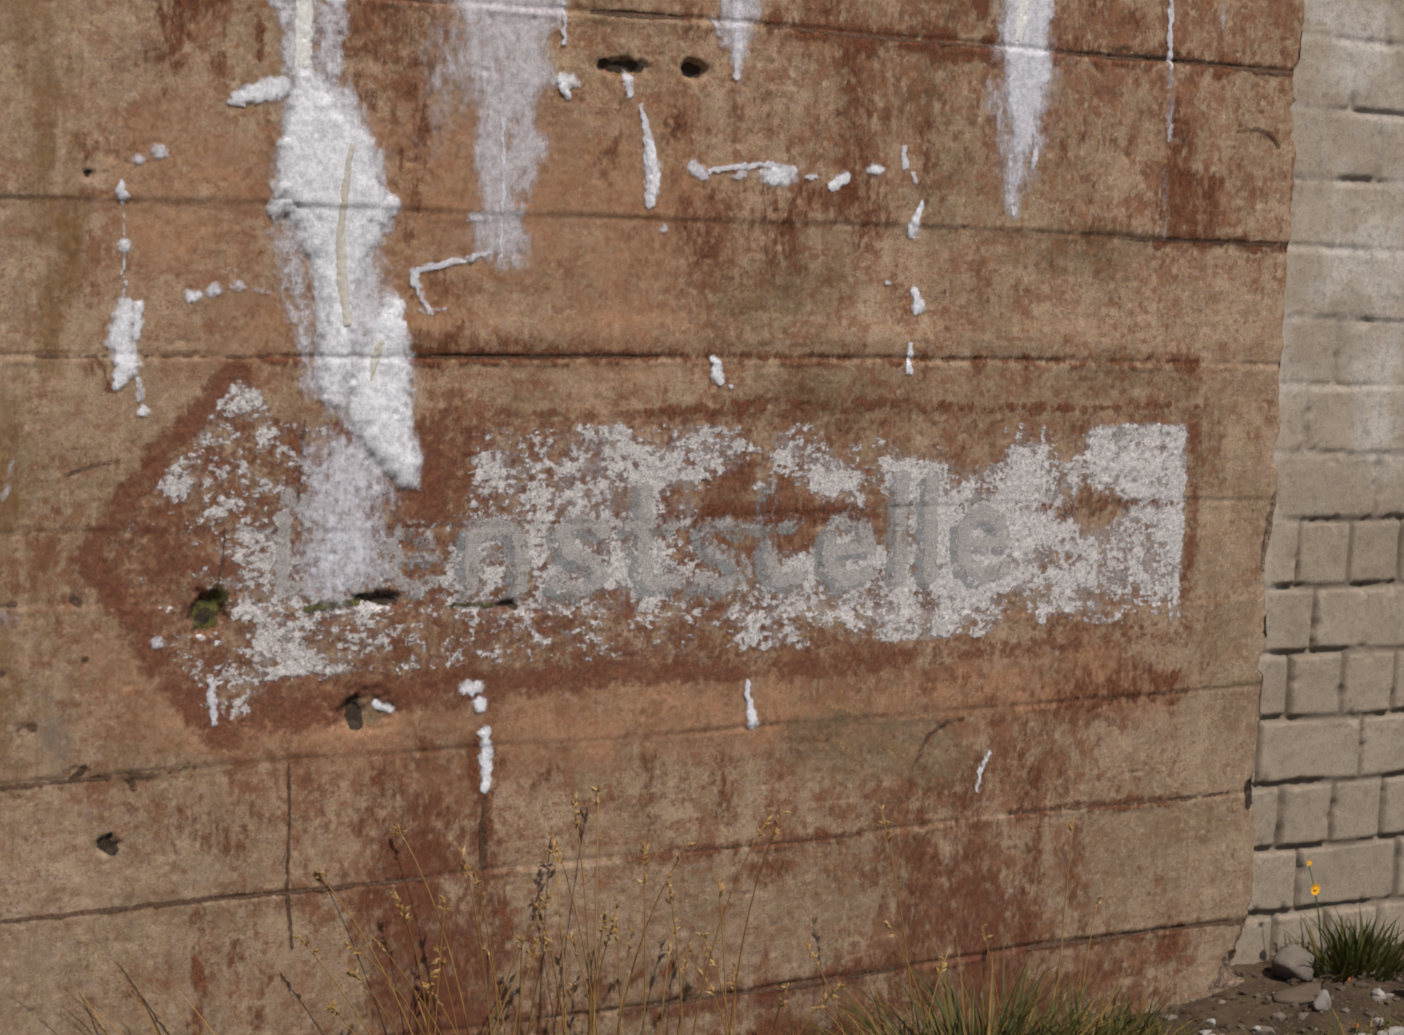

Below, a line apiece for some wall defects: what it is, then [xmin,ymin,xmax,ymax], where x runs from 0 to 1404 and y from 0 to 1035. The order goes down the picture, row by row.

spalling [597,58,644,75]
water stain [973,0,1054,215]
rust [1147,96,1288,254]
water stain [106,179,148,416]
water stain [227,0,577,603]
spalling [303,592,398,613]
spalling [451,601,518,609]
spalling [344,694,394,729]
water stain [460,680,493,793]
crack [0,758,430,949]
rust [156,646,1188,1035]
crack [687,833,862,851]